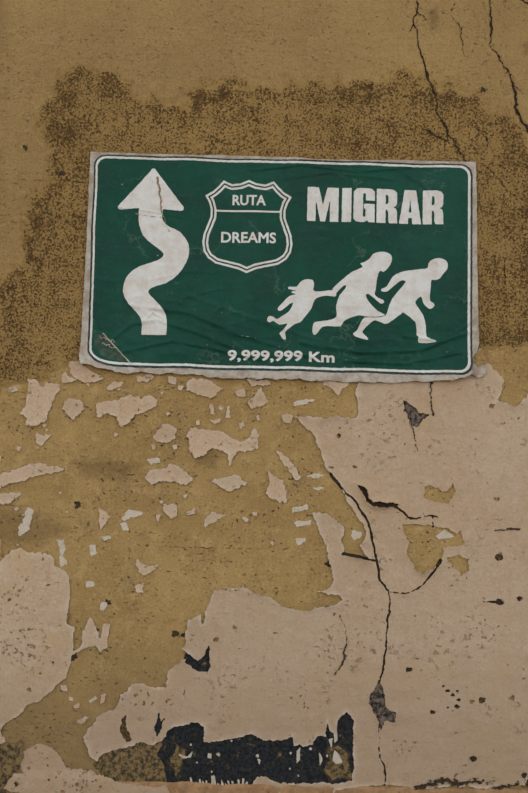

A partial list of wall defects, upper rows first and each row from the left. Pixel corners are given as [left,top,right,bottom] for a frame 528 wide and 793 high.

crack [489,0,528,133]
crack [409,1,517,197]
damp [0,65,528,395]
peeling [482,345,528,409]
peeling [403,400,432,427]
peeling [358,485,399,508]
peeling [0,354,368,793]
crack [329,472,442,683]
peeling [403,523,469,576]
peeling [369,683,396,730]
crack [378,724,386,786]
peeling [414,772,528,790]